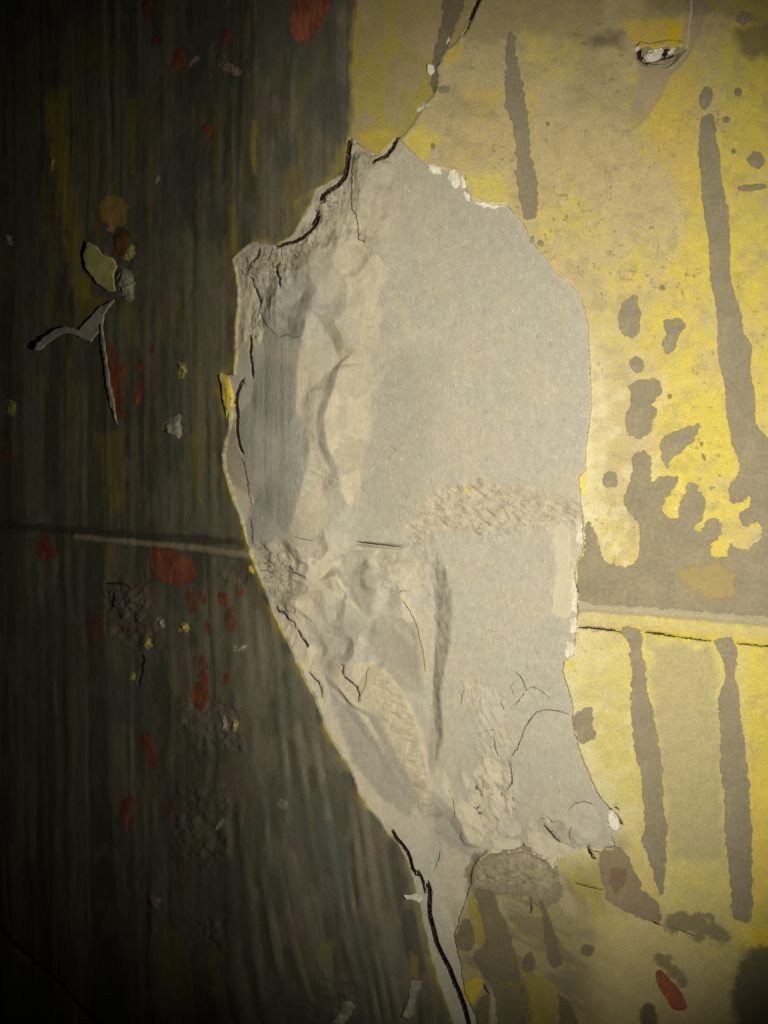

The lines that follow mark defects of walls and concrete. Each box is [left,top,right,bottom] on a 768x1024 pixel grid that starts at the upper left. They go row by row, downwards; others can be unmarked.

peeling [34,241,136,424]
crack [234,138,398,578]
flaking render [217,32,768,1024]
crack [578,627,768,647]
crack [392,671,623,1024]